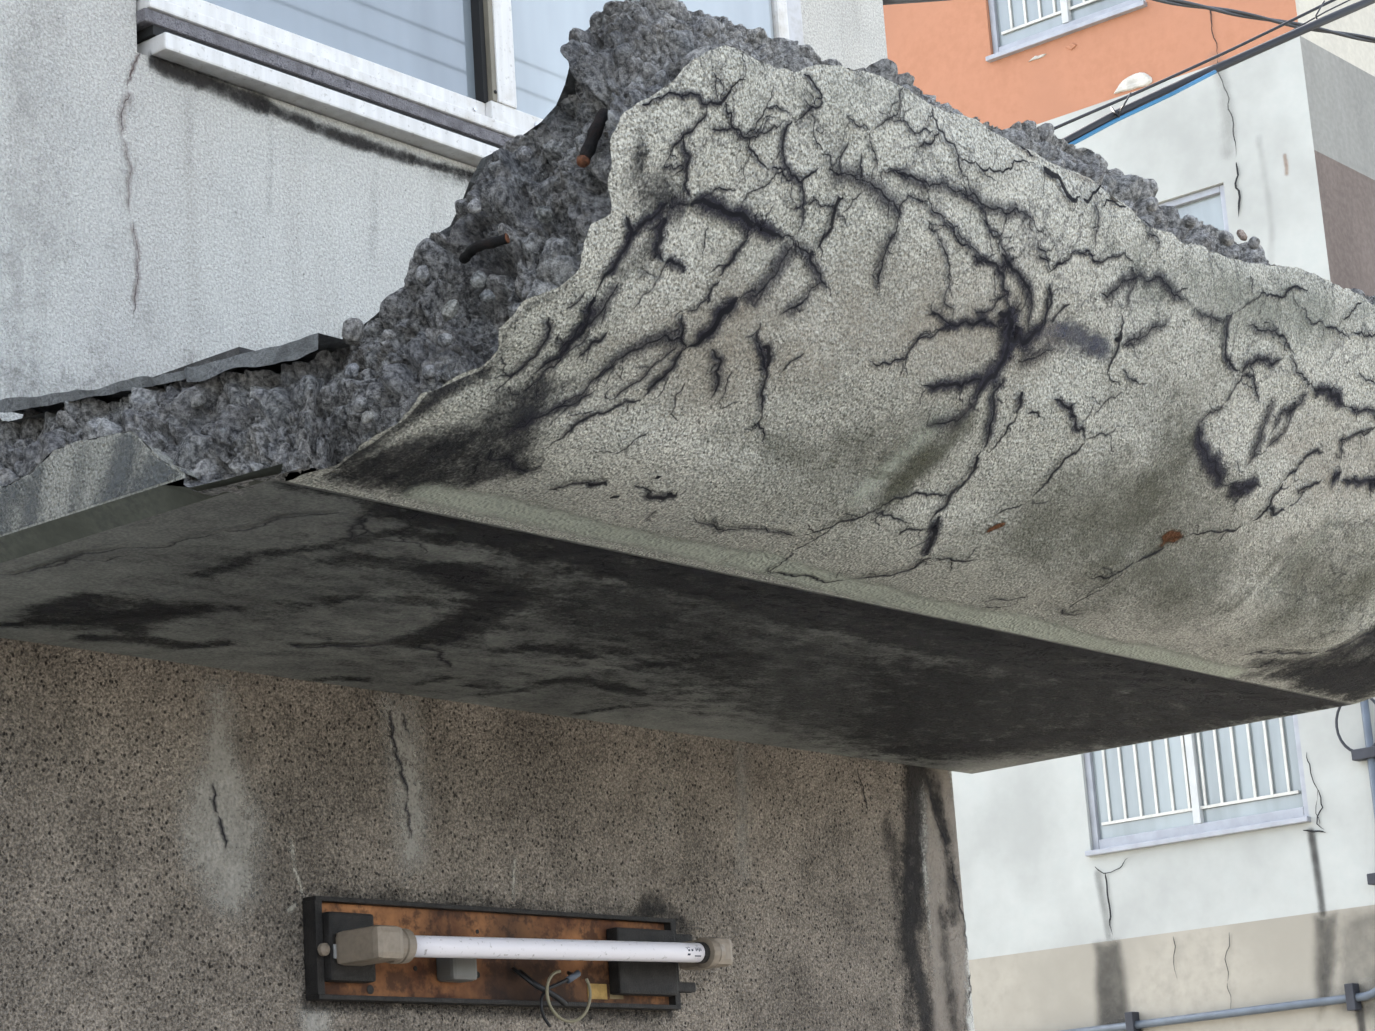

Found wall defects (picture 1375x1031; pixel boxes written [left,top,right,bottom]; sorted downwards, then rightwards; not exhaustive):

crack [1210,11,1241,216]
crack [121,54,140,314]
spalling [0,0,1280,499]
crack [467,52,1375,616]
spalling [1350,288,1375,305]
crack [0,512,428,575]
water stain [0,366,1375,1031]
crack [1244,628,1375,669]
crack [212,786,228,848]
crack [389,711,412,838]
crack [1303,753,1326,833]